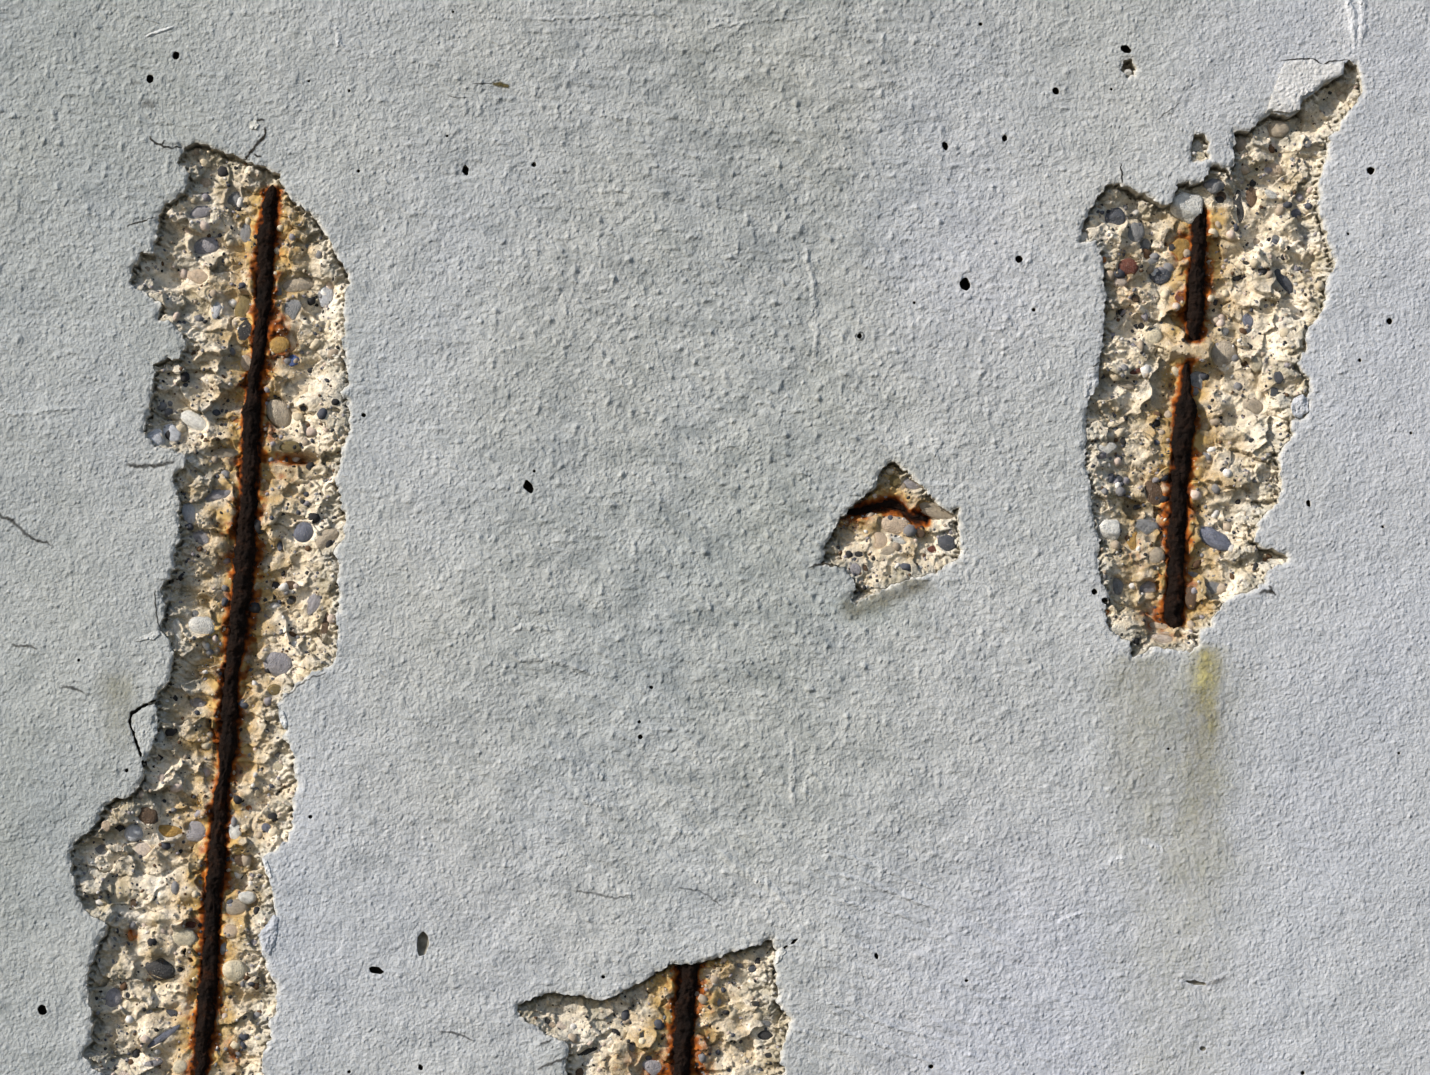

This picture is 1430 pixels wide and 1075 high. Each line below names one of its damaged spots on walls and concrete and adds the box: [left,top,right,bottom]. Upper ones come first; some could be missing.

rust [1140,207,1227,632]
spalling [1079,59,1361,657]
rust [838,474,931,534]
spalling [821,463,960,604]
spalling [71,146,351,1075]
rust [177,186,311,1075]
spalling [517,963,679,1075]
rust [642,959,729,1075]
spalling [695,940,791,1075]